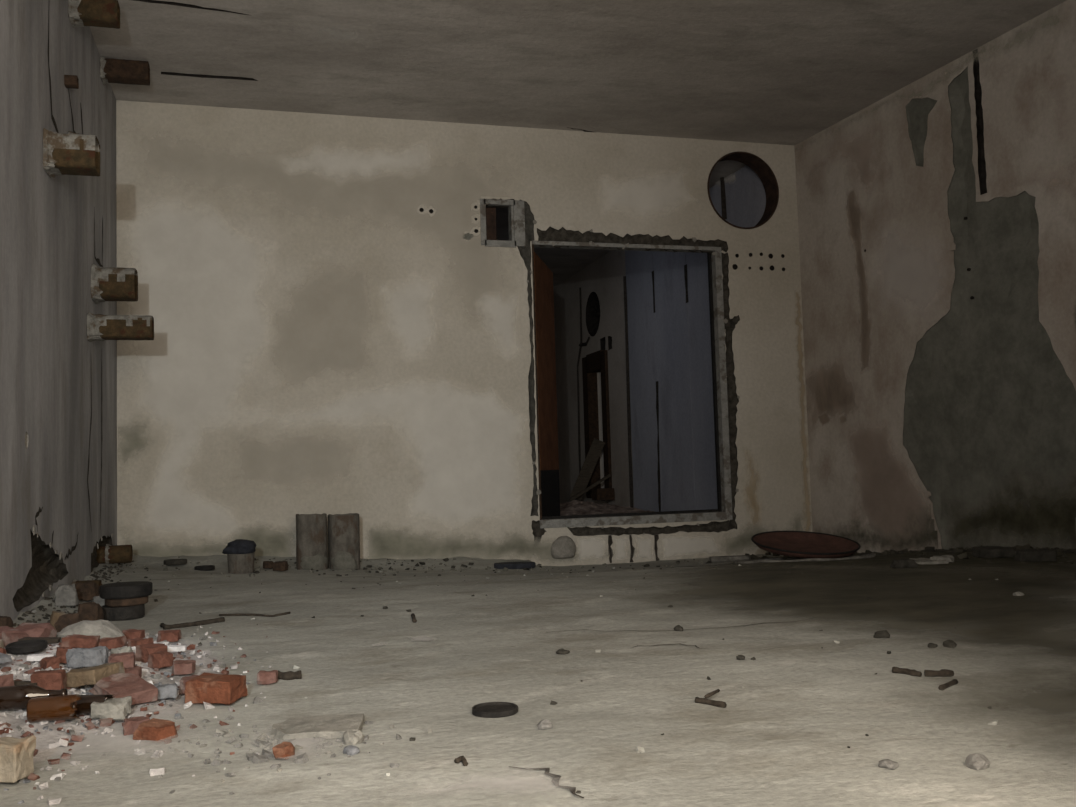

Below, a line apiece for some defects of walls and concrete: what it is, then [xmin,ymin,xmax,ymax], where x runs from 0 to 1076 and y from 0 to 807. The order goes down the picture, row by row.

spalling [903,66,1076,550]
crack [35,506,78,559]
crack [608,535,659,563]